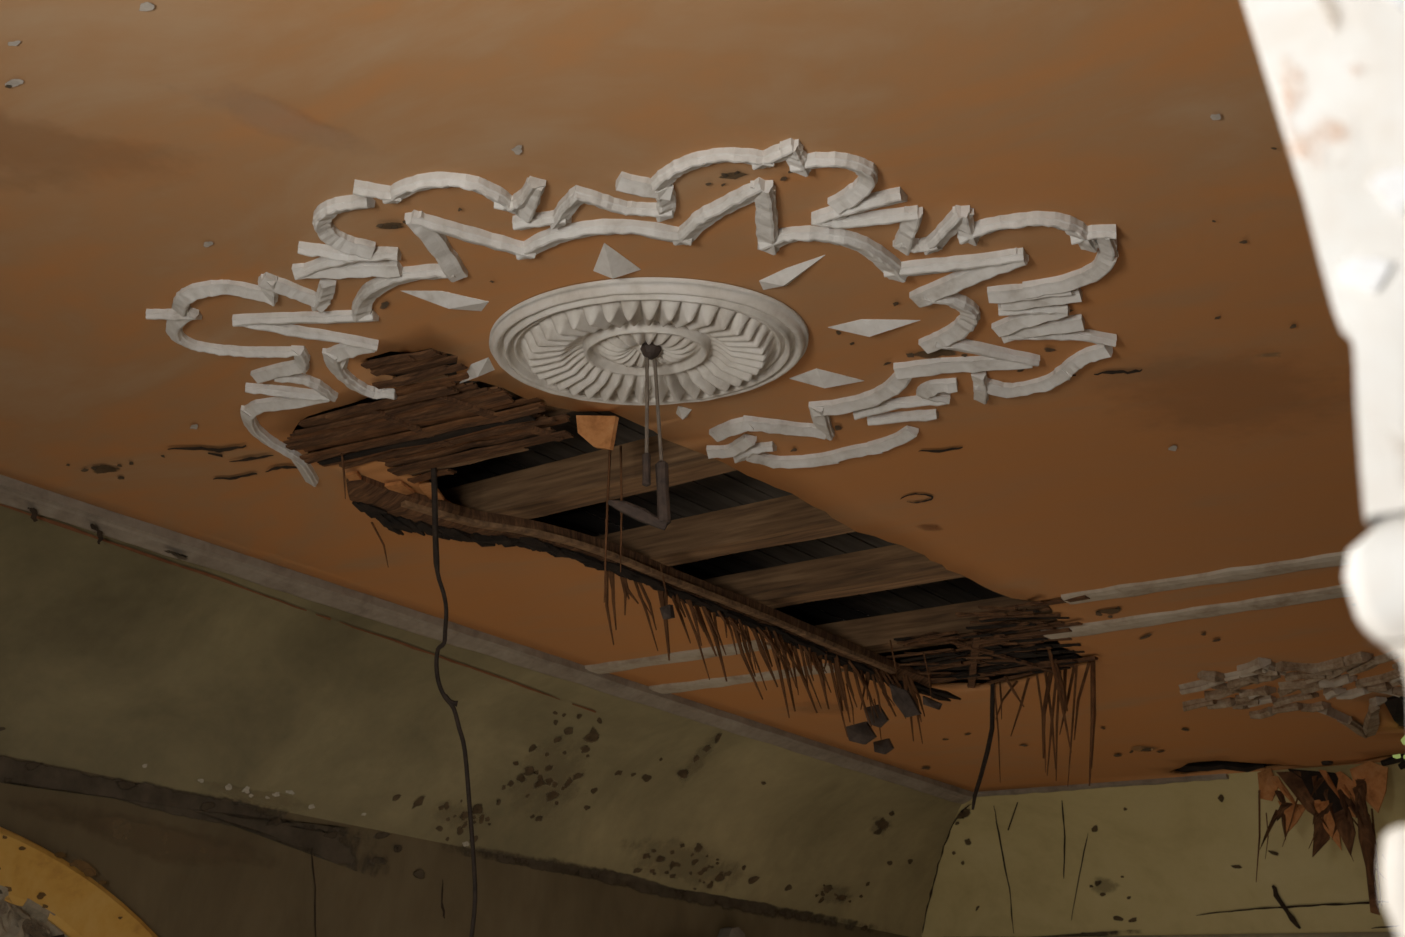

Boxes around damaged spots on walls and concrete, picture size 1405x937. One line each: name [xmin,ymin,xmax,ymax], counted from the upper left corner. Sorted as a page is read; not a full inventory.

spalling [1338,257,1391,292]
peeling [576,415,619,450]
peeling [385,481,444,500]
spalling [19,892,53,937]
crack [1196,885,1393,929]